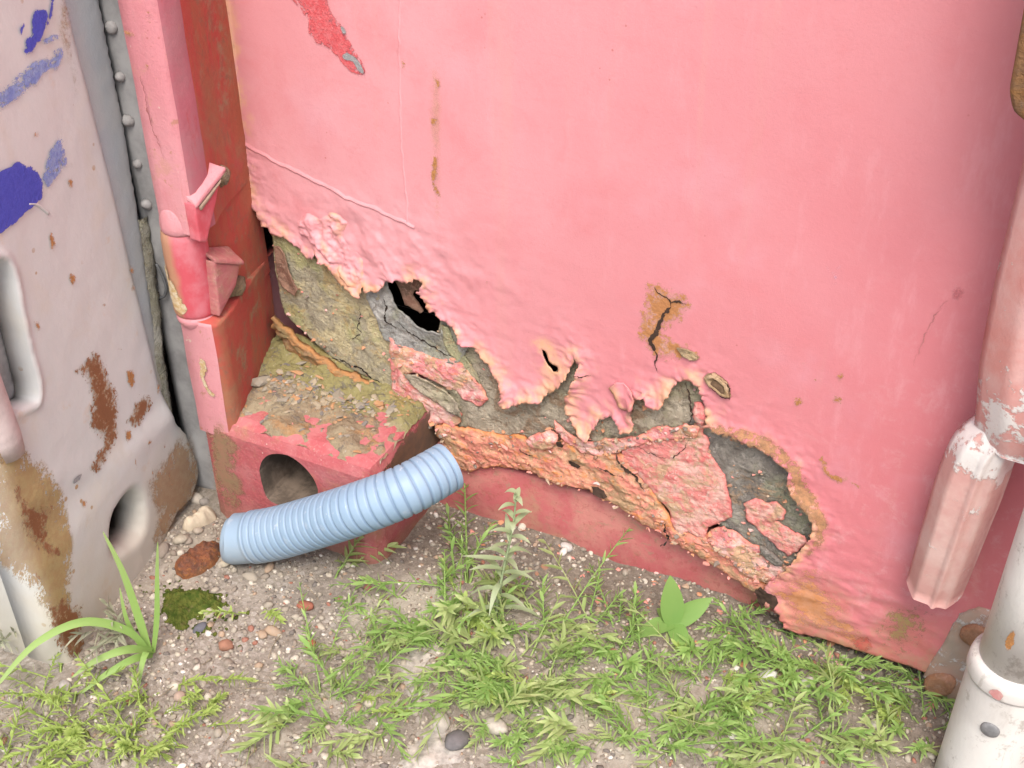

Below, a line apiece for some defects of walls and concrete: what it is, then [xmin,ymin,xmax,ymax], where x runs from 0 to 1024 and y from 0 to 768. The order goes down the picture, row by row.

rust [431,157,440,196]
rust [75,353,160,473]
spalling [272,235,812,584]
crack [597,283,699,490]
rust [14,487,61,557]
rust [152,443,197,543]
rust [242,315,860,642]
rust [48,599,84,658]